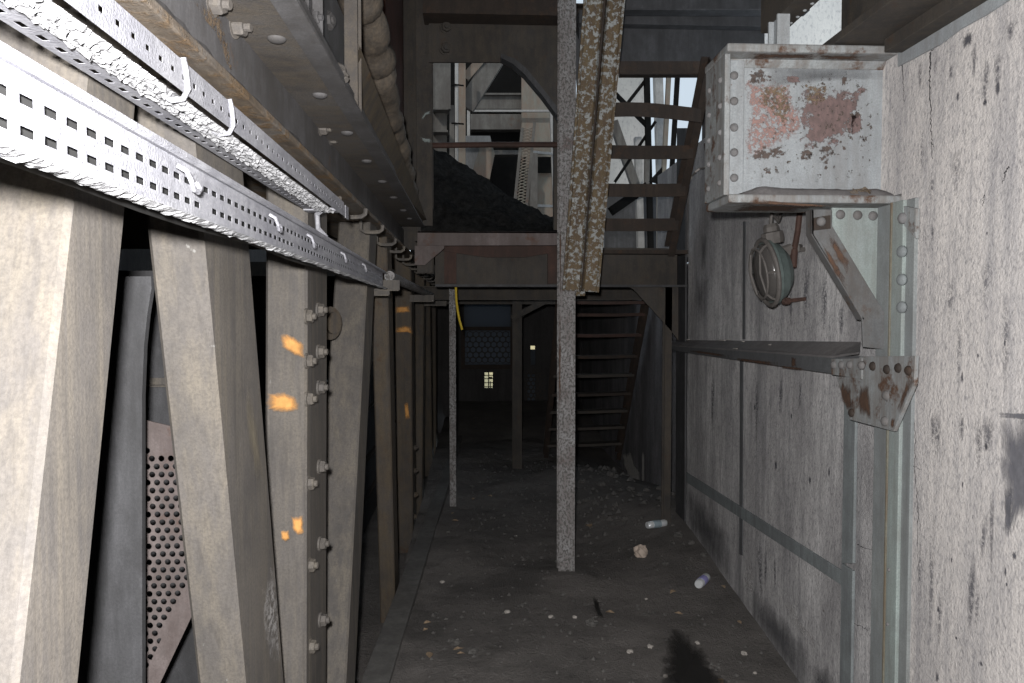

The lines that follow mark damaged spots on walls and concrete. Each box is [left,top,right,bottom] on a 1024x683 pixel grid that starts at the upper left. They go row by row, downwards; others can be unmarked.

corrosion [753,147,783,174]
corrosion [800,146,846,161]
corrosion [841,382,870,416]